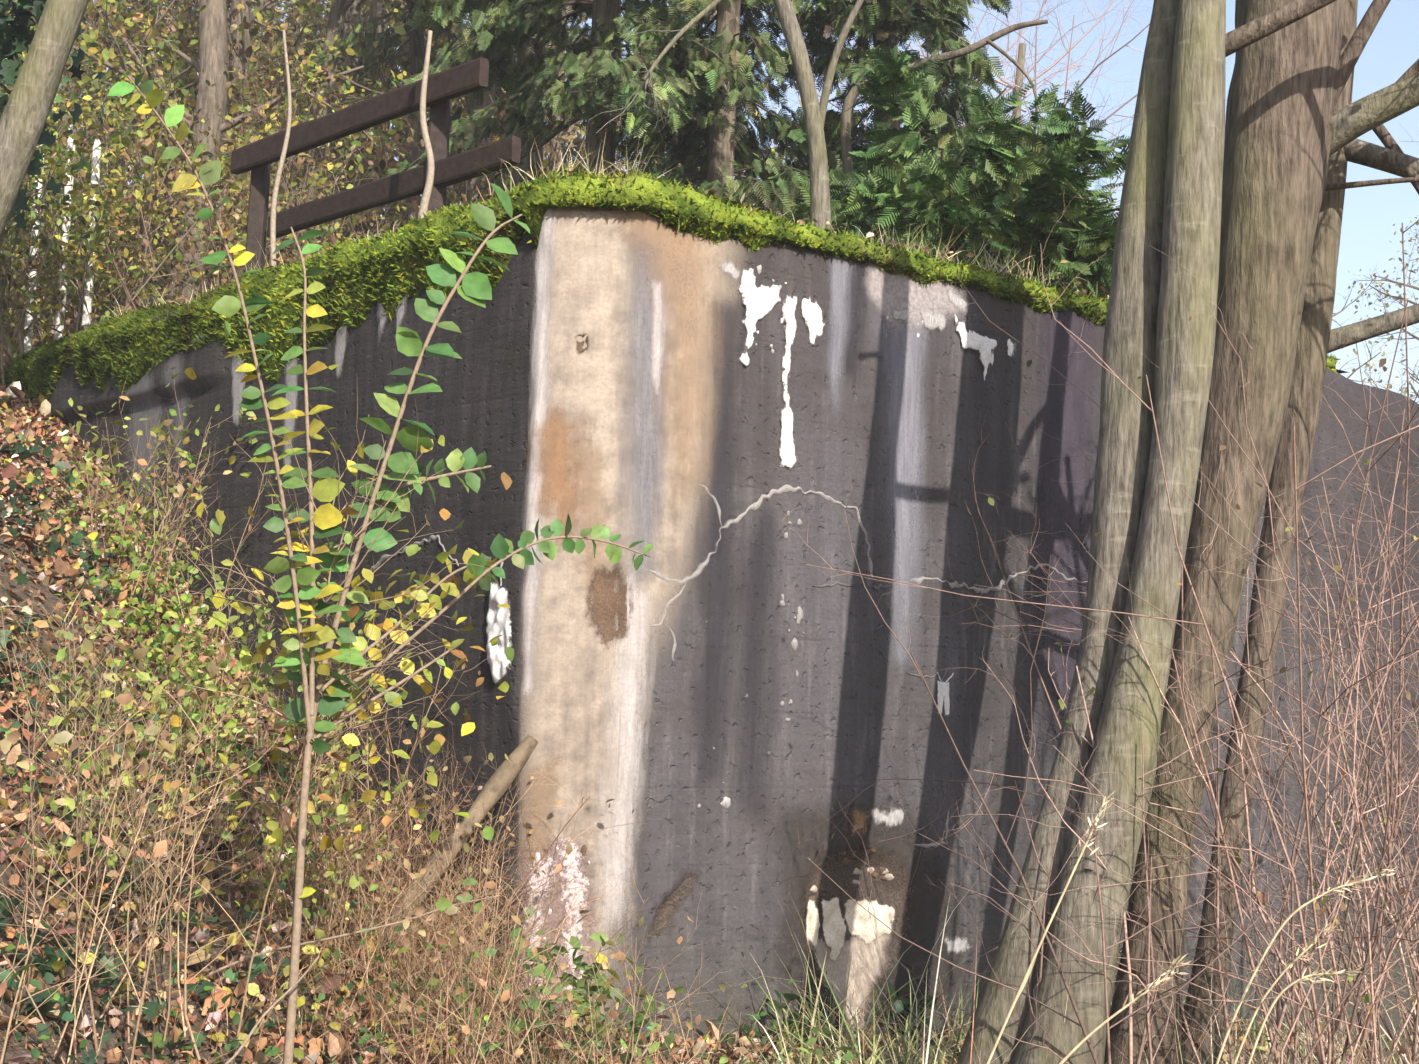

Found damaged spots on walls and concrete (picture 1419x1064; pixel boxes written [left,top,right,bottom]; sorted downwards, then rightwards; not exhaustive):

leakage [486,207,1016,1045]
crack [641,482,1088,661]
spalling [802,808,916,1035]
spalling [914,810,950,848]